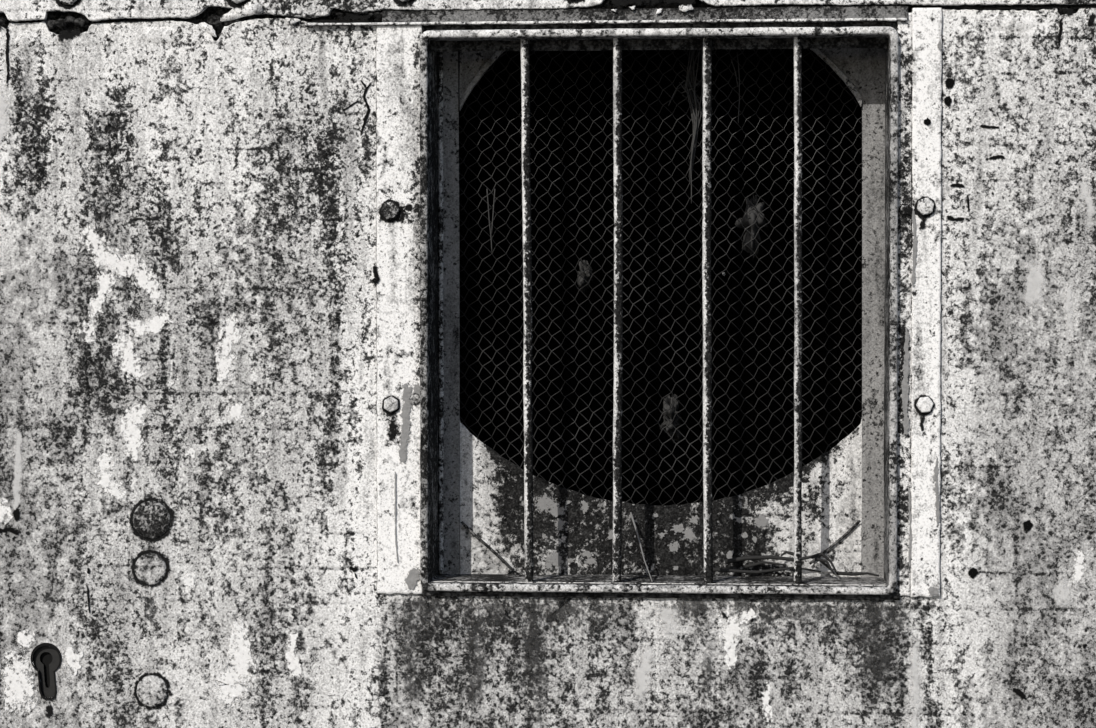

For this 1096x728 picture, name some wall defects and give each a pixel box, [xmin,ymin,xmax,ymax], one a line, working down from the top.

crack [0,2,382,83]
water stain [0,46,46,198]
water stain [67,106,175,398]
water stain [200,295,241,386]
water stain [13,433,23,510]
water stain [94,402,149,501]
water stain [1052,551,1085,605]
water stain [213,619,257,707]
water stain [285,627,302,677]
water stain [374,595,631,728]
water stain [761,682,773,727]
water stain [659,598,911,695]